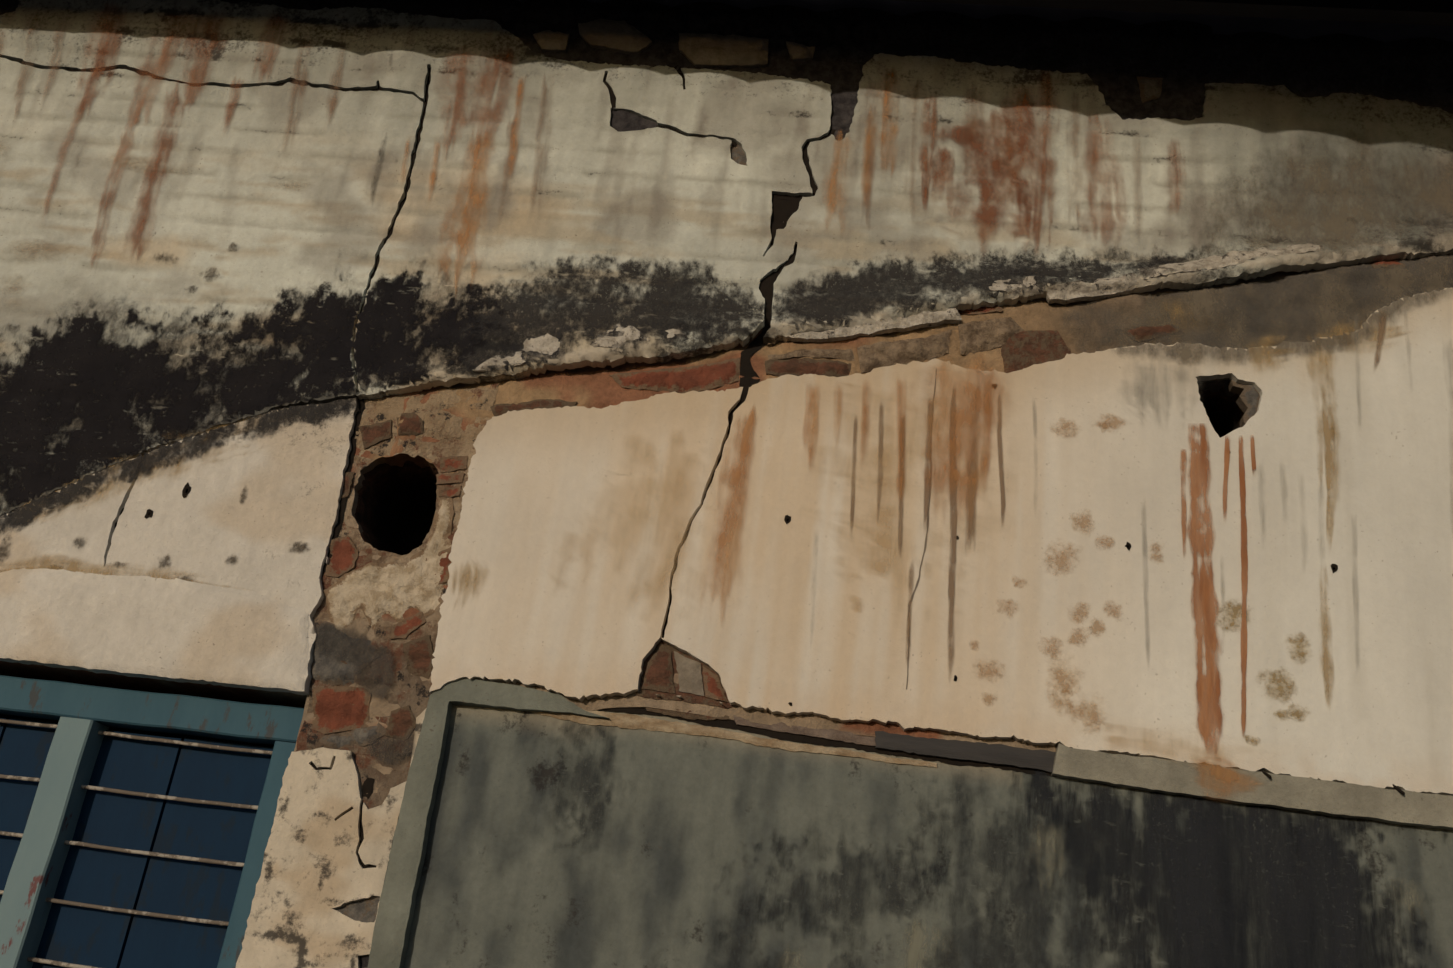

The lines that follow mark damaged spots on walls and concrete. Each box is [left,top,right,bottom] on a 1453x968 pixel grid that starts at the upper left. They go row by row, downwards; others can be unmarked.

corrosion [132,134,172,253]
crack [0,56,431,580]
spalling [296,333,577,809]
crack [603,73,616,112]
spalling [498,4,889,141]
damp [0,146,1453,575]
crack [661,129,836,642]
damp [924,392,977,663]
corrosion [921,77,1052,239]
corrosion [1181,424,1256,784]
spalling [1198,380,1260,453]
damp [906,770,1424,968]